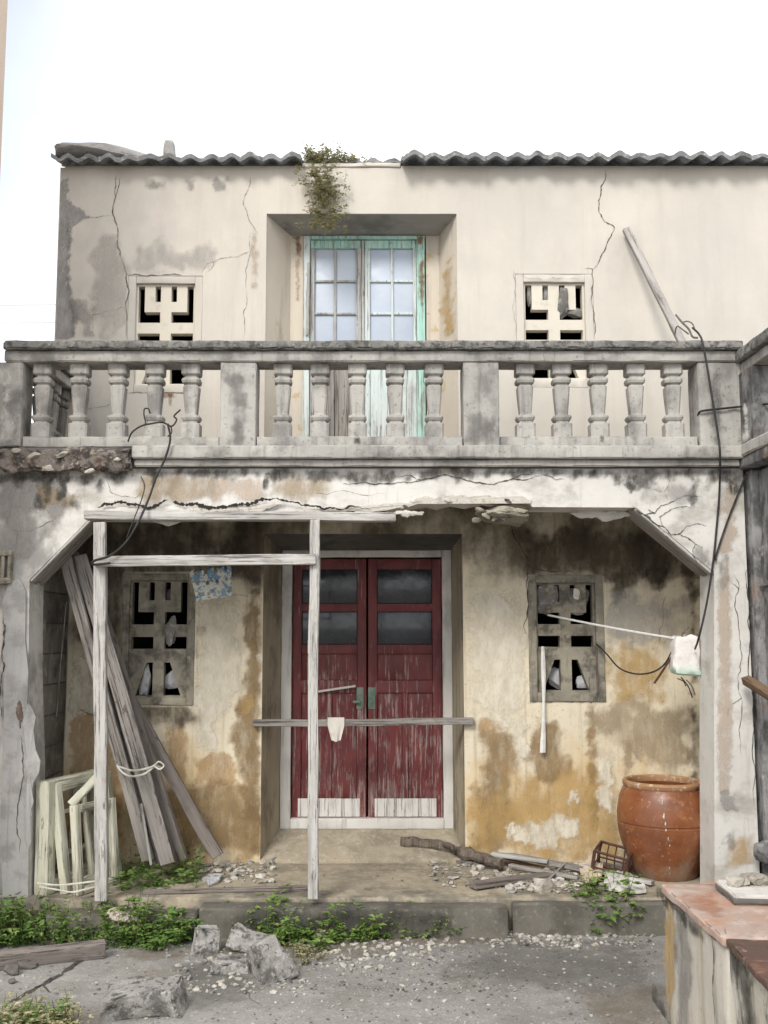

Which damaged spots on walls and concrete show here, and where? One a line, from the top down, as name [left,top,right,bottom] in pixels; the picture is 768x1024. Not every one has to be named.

crack [56,178,256,328]
crack [514,173,615,335]
corrosion [443,261,453,334]
spalling [0,446,133,474]
water stain [139,469,247,500]
crack [97,474,558,510]
water stain [263,469,439,498]
spalling [295,495,532,527]
crack [632,470,706,562]
water stain [167,591,261,858]
water stain [470,648,692,859]
peeling [506,790,579,850]